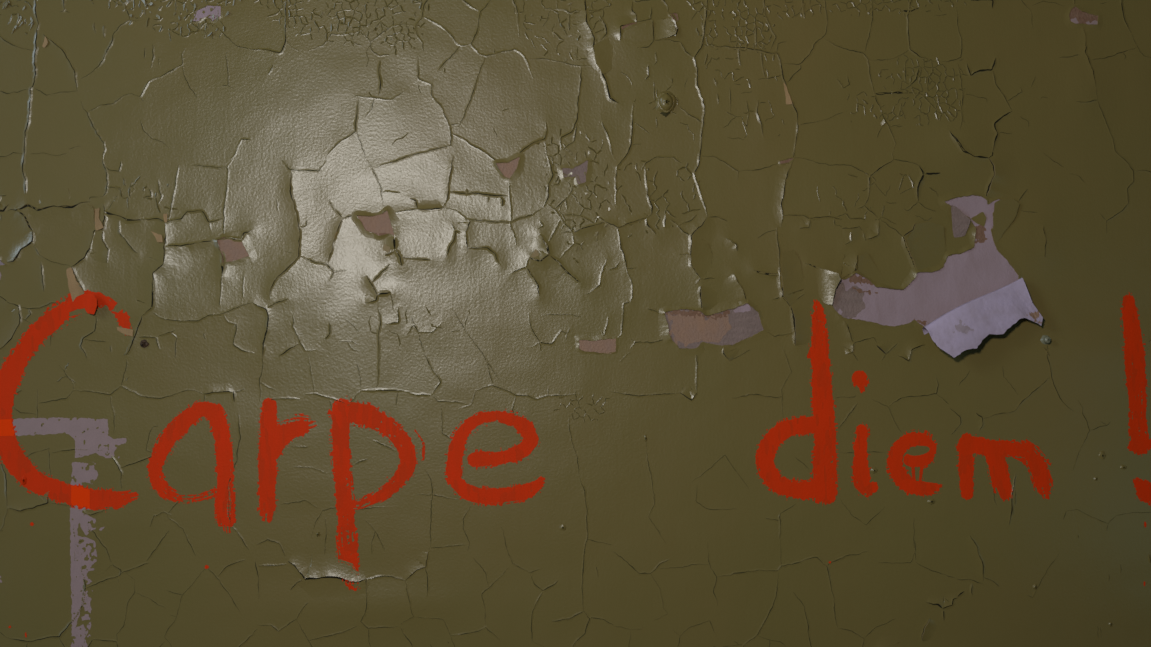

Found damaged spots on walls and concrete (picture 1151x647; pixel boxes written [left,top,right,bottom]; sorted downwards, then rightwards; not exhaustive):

peeling [191,4,223,24]
peeling [492,152,525,183]
peeling [211,230,257,266]
peeling [351,206,400,252]
crack [0,0,1023,434]
peeling [816,190,1043,358]
peeling [658,299,769,357]
crack [272,264,699,647]
crack [0,425,159,647]
crack [227,413,466,630]
crack [991,473,1017,525]
crack [919,583,974,641]